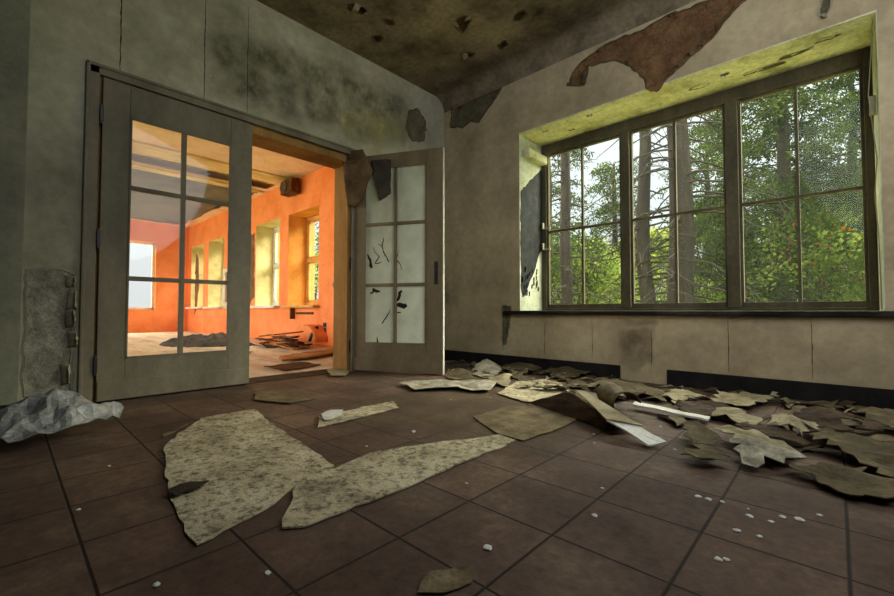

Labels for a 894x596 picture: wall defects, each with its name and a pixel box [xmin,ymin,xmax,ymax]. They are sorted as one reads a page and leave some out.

spalling [452,15,472,33]
flaking render [566,0,747,92]
spalling [743,34,841,76]
spalling [405,108,427,142]
peeling [520,169,542,297]
peeling [19,267,79,398]